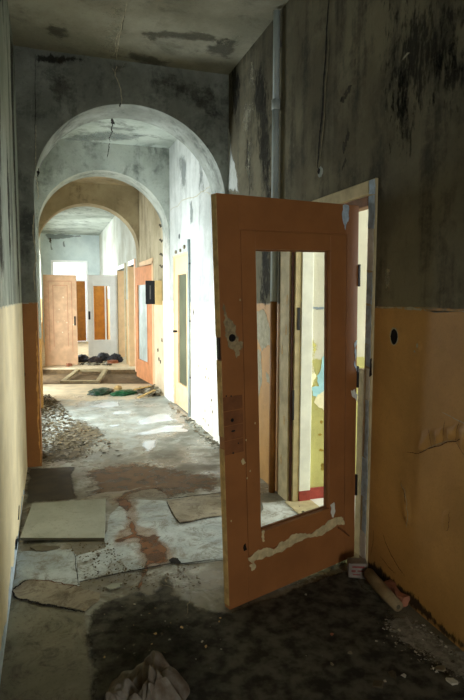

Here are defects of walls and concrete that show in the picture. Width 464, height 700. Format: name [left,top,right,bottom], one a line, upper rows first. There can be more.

crack [107,2,127,157]
efflorescence [228,129,237,191]
water stain [230,66,240,123]
water stain [245,67,271,198]
water stain [385,5,464,155]
water stain [259,251,271,307]
water stain [86,561,464,700]